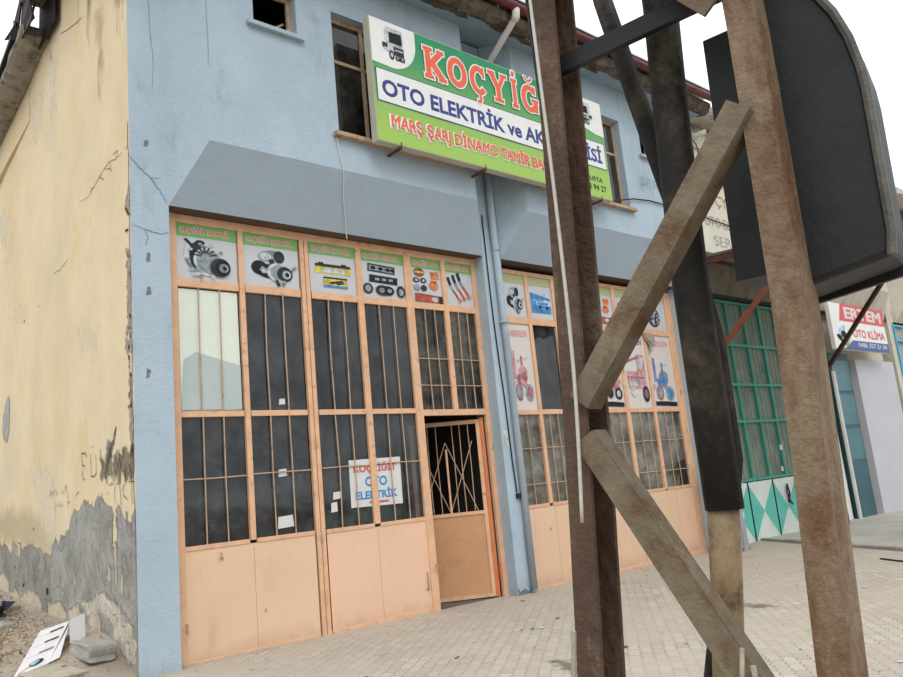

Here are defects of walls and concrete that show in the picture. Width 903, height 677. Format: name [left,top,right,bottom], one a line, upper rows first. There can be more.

crack [82,121,167,203]
crack [129,205,169,278]
flaking render [2,396,10,442]
crack [129,383,137,561]
flaking render [0,494,139,677]